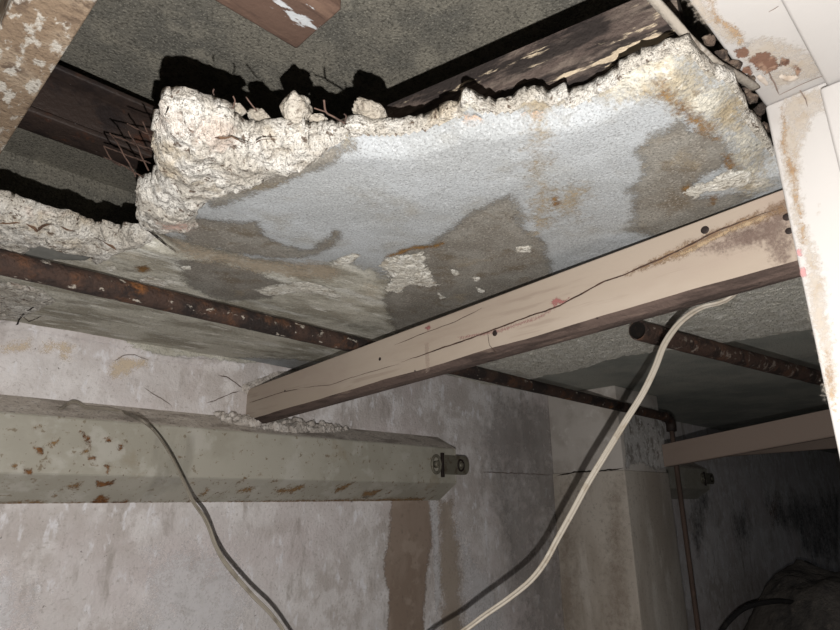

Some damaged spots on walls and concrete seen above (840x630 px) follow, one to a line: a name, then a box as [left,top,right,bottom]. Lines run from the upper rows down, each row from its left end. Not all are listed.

peeling [734,47,801,86]
spalling [0,99,370,272]
leakage [599,54,777,237]
peeling [682,169,755,199]
leakage [0,275,347,363]
leakage [48,195,552,341]
crack [208,207,782,403]
peeling [515,245,532,253]
leakage [633,90,834,400]
corrosion [0,430,211,504]
corrosion [230,476,425,502]
crack [484,468,622,476]